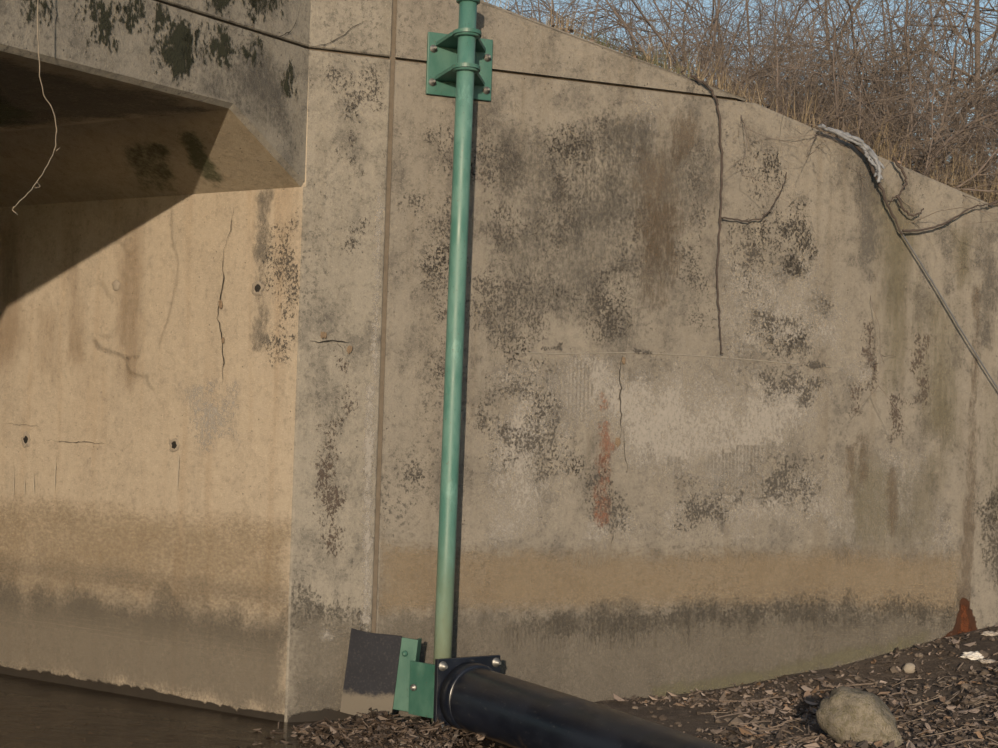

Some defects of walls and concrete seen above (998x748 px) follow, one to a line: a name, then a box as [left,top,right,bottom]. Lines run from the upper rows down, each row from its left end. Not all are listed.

leakage [20,0,53,26]
leakage [74,0,146,54]
crack [217,210,234,382]
leakage [398,191,452,325]
leakage [466,116,925,548]
leakage [0,199,381,741]
crack [615,356,628,472]
leakage [452,590,977,702]